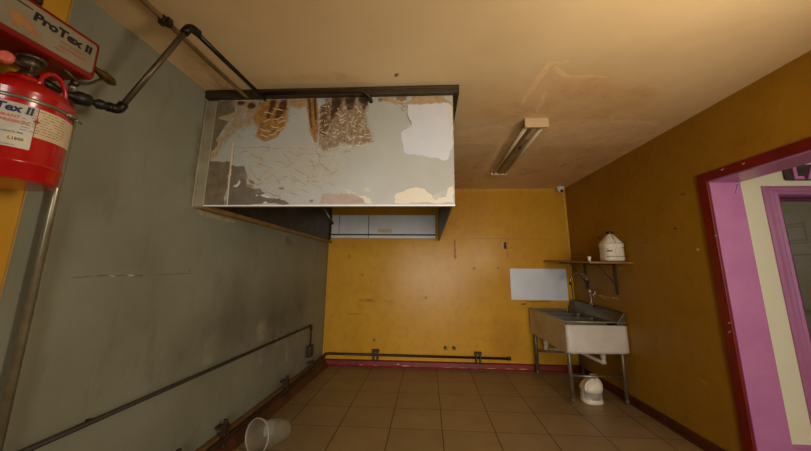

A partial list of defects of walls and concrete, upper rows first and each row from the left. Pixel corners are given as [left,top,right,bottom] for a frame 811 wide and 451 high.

crack [232,104,370,196]
peeling [378,96,454,161]